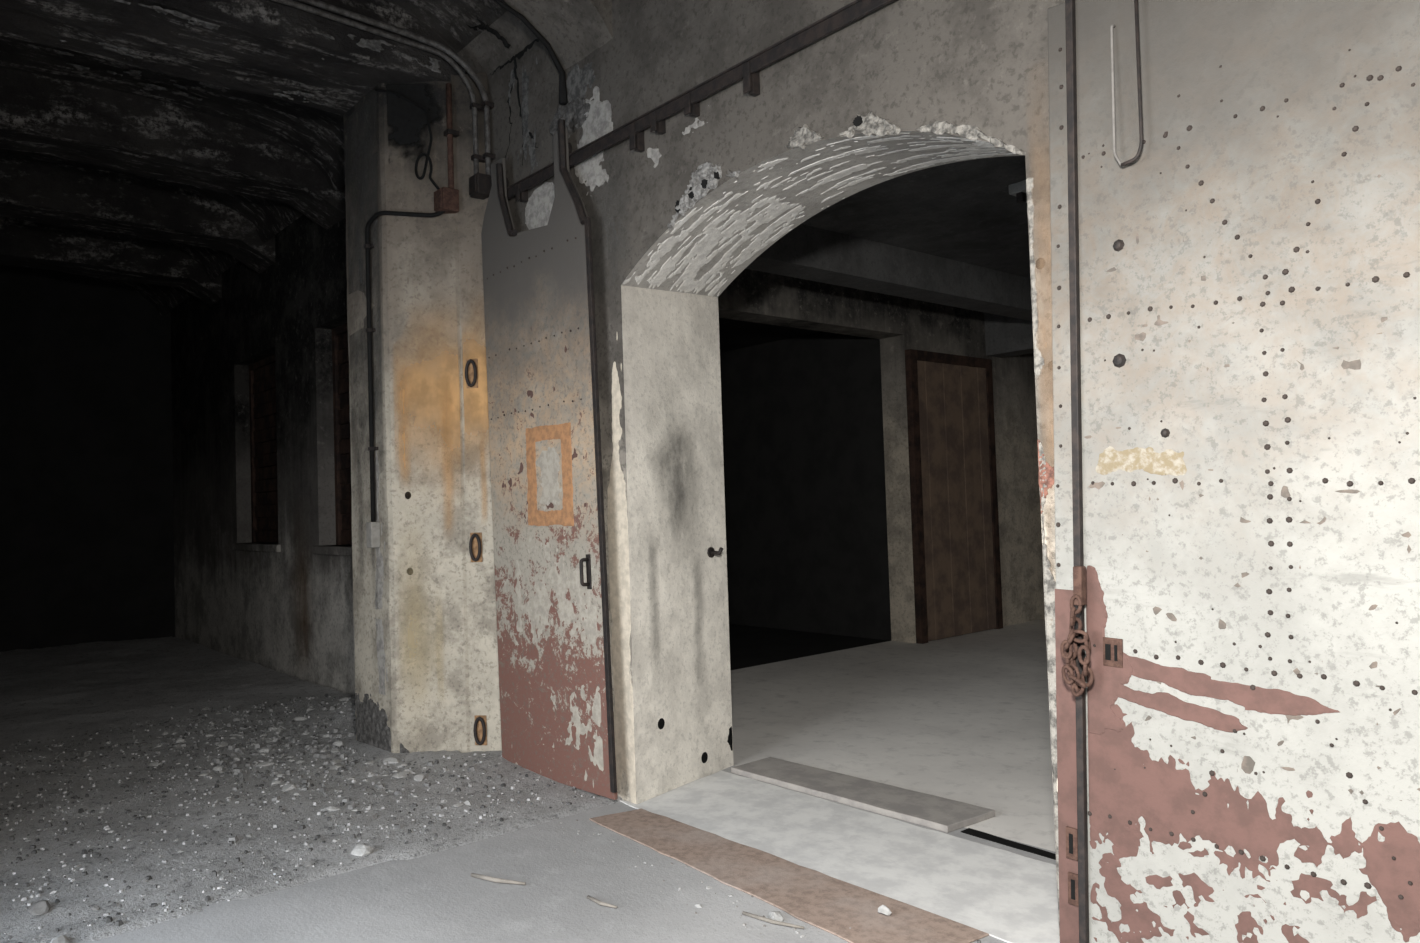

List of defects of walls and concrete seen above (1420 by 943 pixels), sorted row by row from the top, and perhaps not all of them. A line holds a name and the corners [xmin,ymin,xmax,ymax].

rust [400,339,489,460]
peeling [508,57,613,230]
peeling [682,105,709,135]
peeling [623,111,1026,296]
spalling [1026,178,1044,378]
peeling [1135,315,1169,341]
peeling [1333,347,1361,370]
peeling [499,361,636,804]
spalling [1037,439,1060,936]
peeling [1086,565,1420,943]